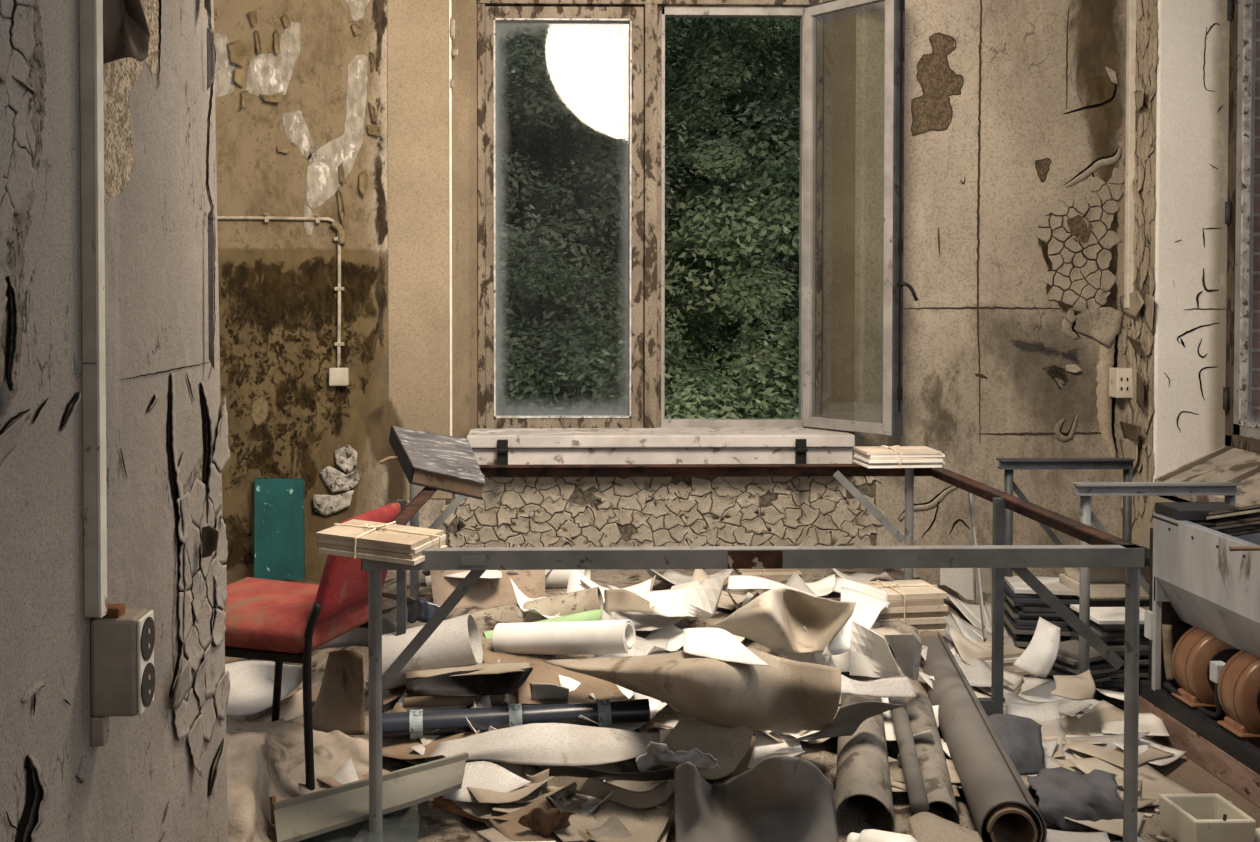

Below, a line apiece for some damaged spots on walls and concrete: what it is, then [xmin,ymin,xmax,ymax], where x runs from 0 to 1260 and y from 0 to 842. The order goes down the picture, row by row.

peeling [0,0,46,401]
peeling [103,0,162,202]
peeling [910,32,964,136]
water stain [1070,0,1122,201]
peeling [0,414,26,466]
crack [121,17,218,694]
water stain [218,249,405,585]
crack [441,476,970,547]
crack [1036,147,1125,458]
crack [21,680,71,716]
crack [6,753,88,842]
crack [208,738,226,796]